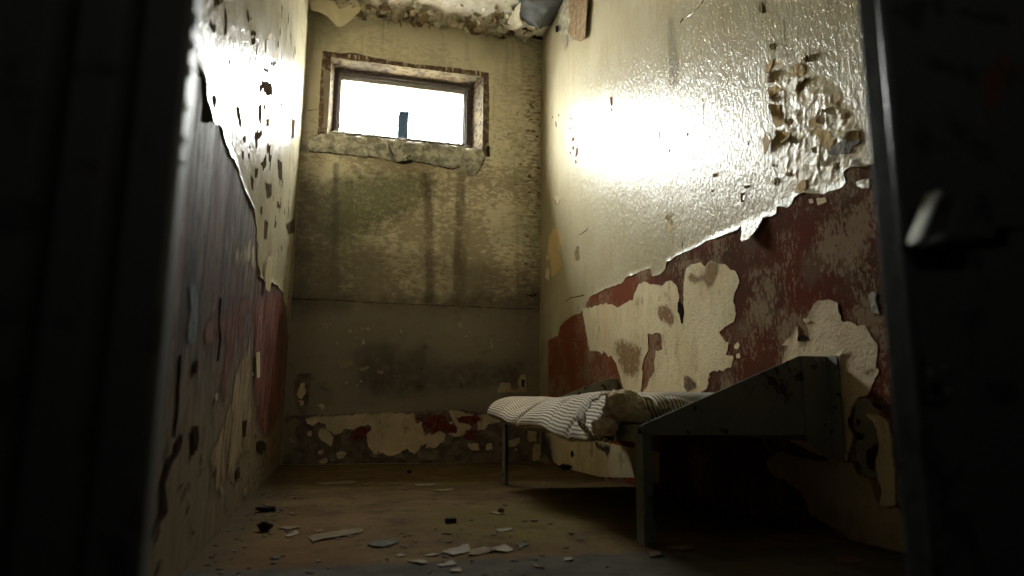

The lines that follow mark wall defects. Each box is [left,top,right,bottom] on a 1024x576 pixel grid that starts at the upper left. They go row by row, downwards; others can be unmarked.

peeling [148,0,561,576]
damp [284,171,540,428]
peeling [548,155,901,539]